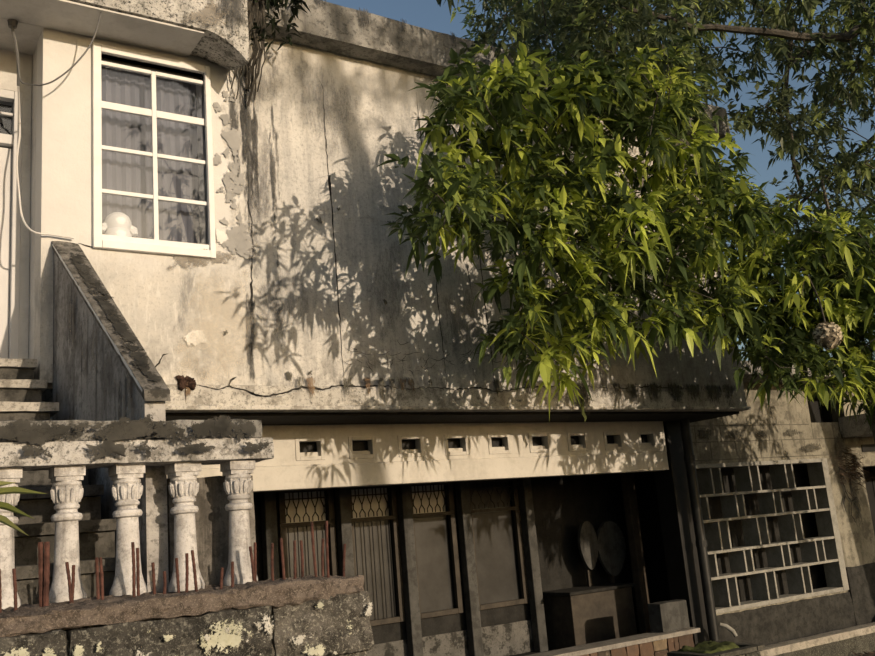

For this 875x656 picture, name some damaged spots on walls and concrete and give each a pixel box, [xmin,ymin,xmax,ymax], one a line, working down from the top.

leakage [70,252,162,389]
leakage [0,286,273,463]
peeling [184,330,207,346]
leakage [168,249,236,269]
peeling [213,90,255,259]
leakage [229,68,261,217]
leakage [269,106,280,218]
crack [199,82,555,397]
corrosion [363,377,415,398]
leakage [576,381,736,422]